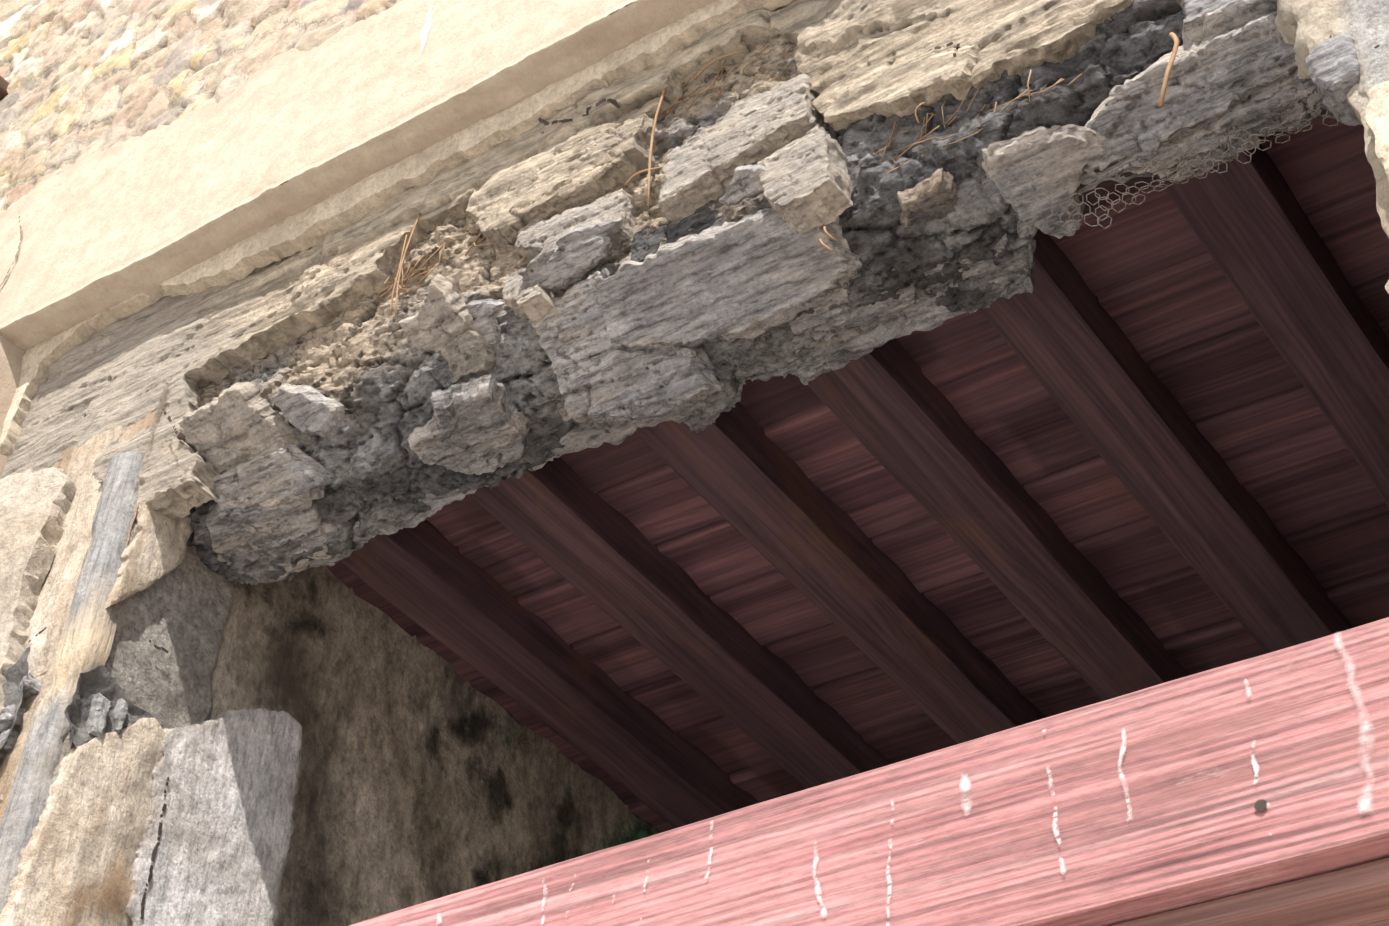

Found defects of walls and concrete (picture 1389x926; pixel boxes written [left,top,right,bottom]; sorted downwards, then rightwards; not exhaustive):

crack [0,216,23,287]
peeling [105,0,1325,609]
crack [140,777,169,920]